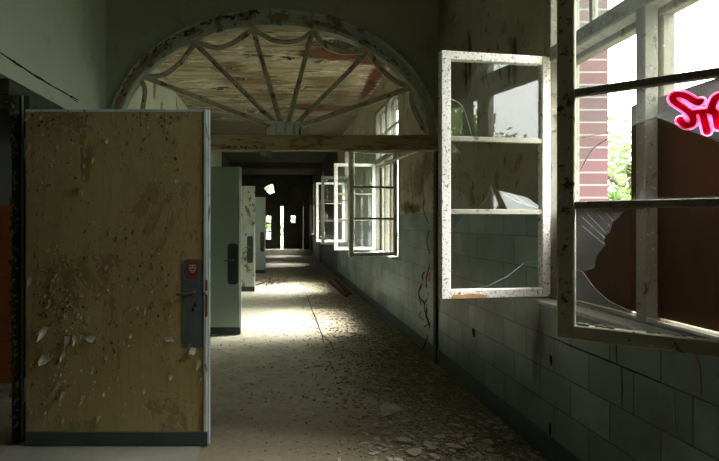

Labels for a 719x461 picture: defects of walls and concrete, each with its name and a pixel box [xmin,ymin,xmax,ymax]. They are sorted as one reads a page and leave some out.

crack [0,52,78,102]
flaking render [105,9,290,144]
peeling [27,237,178,415]
crack [306,293,332,345]